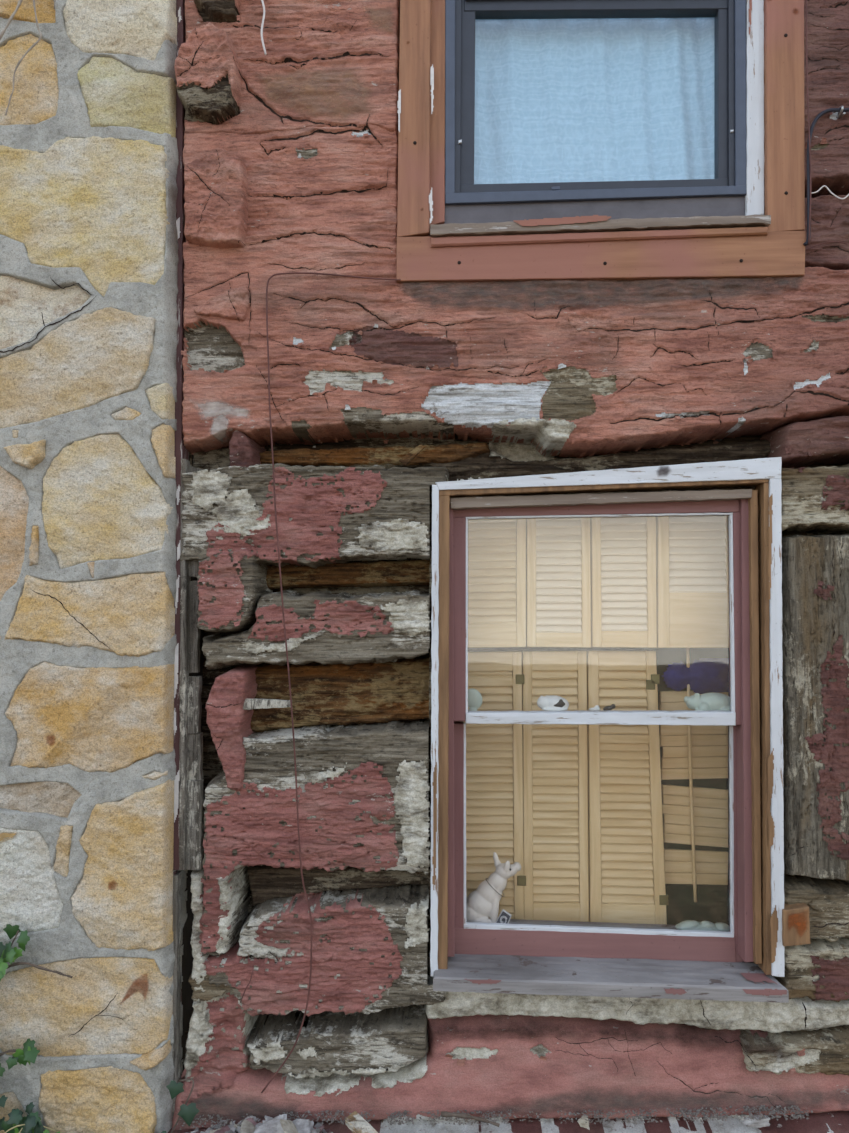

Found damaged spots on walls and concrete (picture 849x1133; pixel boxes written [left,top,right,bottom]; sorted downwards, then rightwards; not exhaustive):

crack [177,6,389,155]
peeling [303,324,458,395]
peeling [341,363,619,444]
crack [531,296,849,440]
peeling [197,466,394,642]
peeling [804,635,849,860]
peeling [181,762,402,1104]
crack [556,998,795,1110]
peeling [380,1114,513,1133]
peeling [539,1118,559,1133]
peeling [601,1116,647,1133]
peeling [667,1114,762,1133]